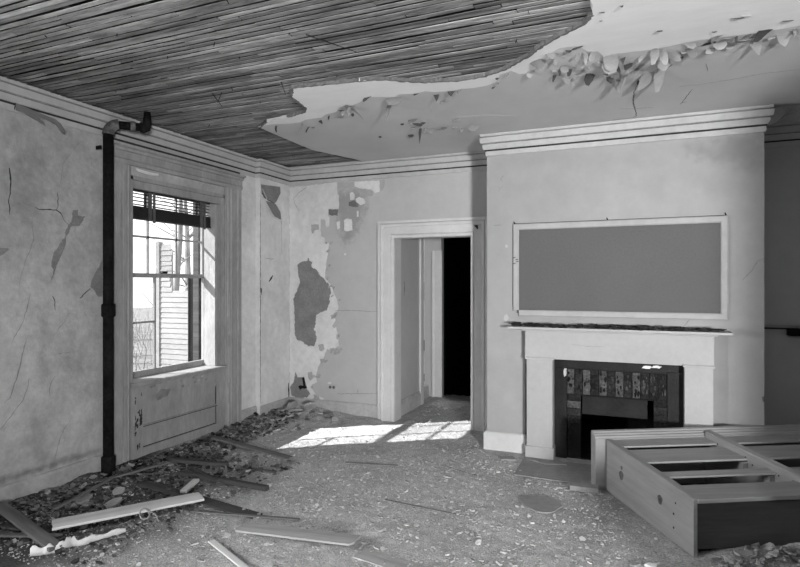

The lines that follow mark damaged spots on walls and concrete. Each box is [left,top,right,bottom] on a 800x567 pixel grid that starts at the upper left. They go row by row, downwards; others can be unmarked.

flaking render [0,0,800,167]
flaking render [50,210,87,285]
peeling [289,180,385,400]